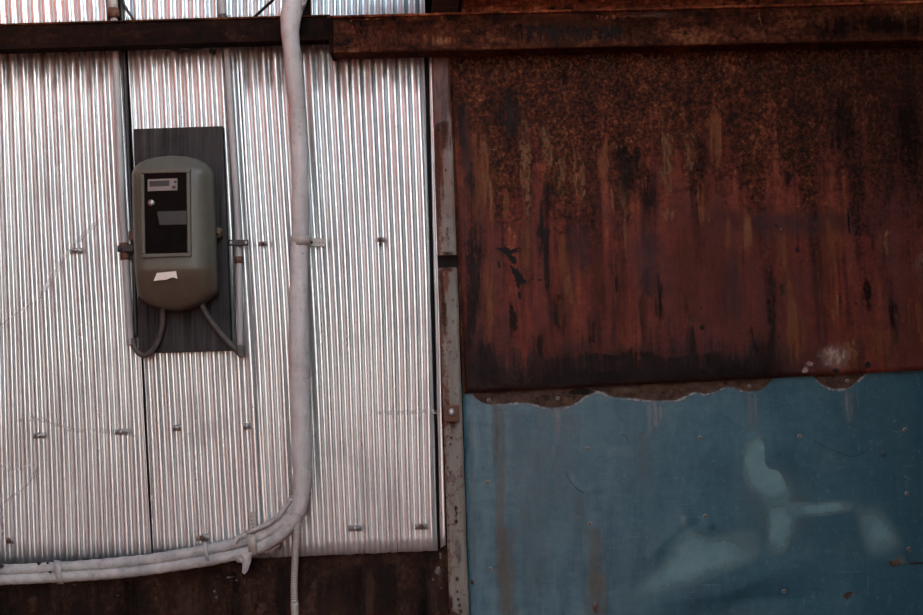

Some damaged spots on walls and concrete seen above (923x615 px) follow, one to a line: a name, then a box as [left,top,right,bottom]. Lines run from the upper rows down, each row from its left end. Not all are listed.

corrosion [435,121,448,217]
corrosion [520,132,530,216]
corrosion [542,128,585,195]
corrosion [706,111,722,165]
corrosion [439,267,452,331]
peeling [473,378,772,410]
corrosion [448,577,462,615]